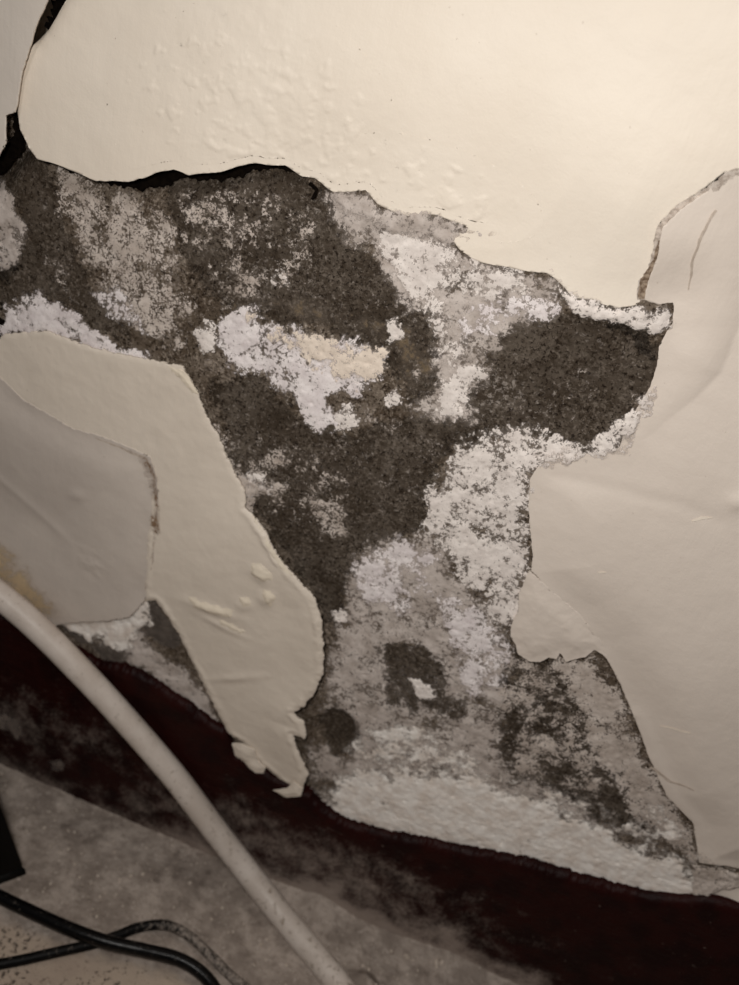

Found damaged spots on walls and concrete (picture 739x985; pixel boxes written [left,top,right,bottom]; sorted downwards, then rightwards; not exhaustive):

peeling [0,0,49,155]
crack [45,0,66,30]
flaking render [0,142,43,262]
crack [637,169,739,300]
water stain [0,140,707,894]
peeling [0,164,739,896]